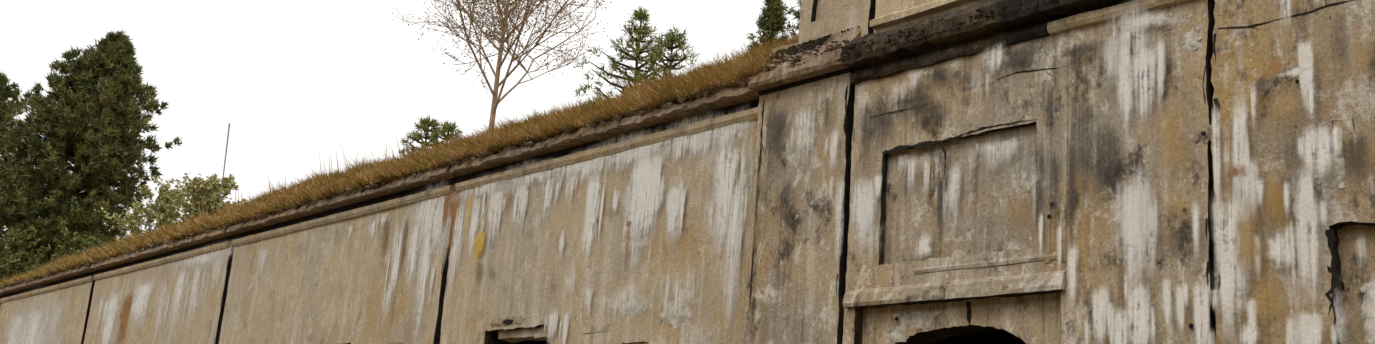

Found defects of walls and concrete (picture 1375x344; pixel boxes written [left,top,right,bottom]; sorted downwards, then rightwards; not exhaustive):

rust [442,191,460,249]
damp [369,98,838,332]
damp [1035,7,1165,300]
damp [1084,43,1367,344]
crack [1203,0,1352,344]
crack [1292,105,1370,132]
rust [117,297,131,343]
damp [97,247,233,344]
damp [544,312,569,344]